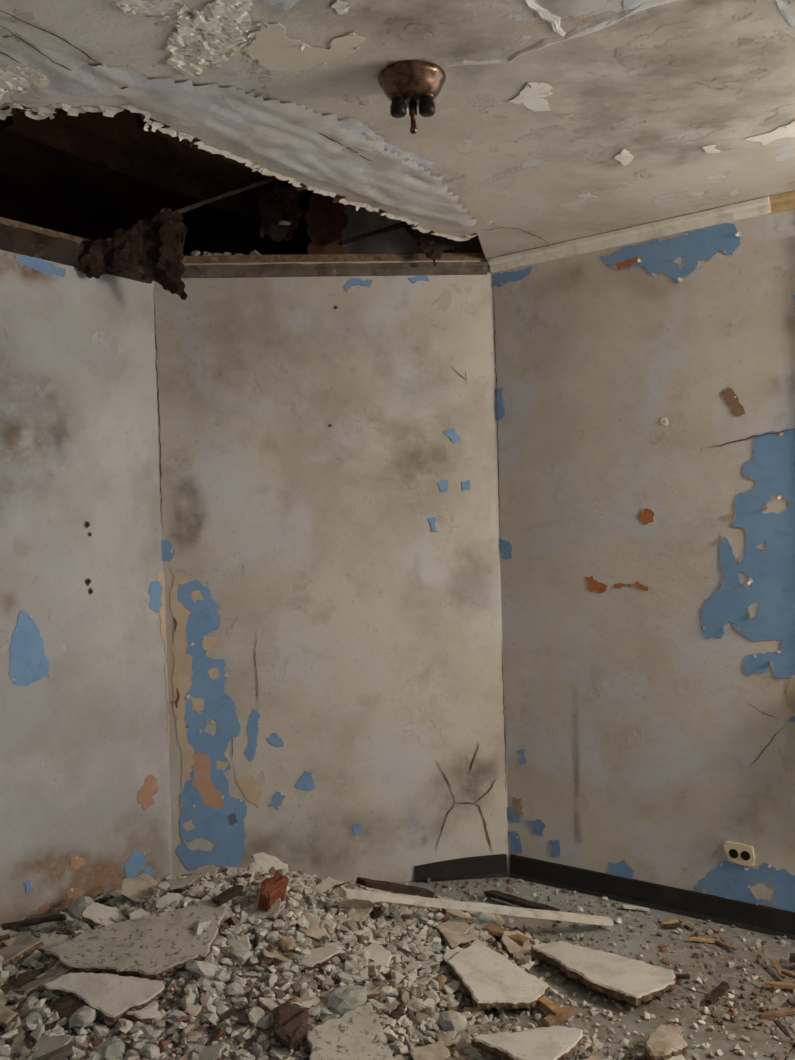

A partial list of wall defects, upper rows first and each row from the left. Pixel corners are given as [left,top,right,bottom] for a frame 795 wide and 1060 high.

peeling [108,0,366,77]
spalling [0,64,478,241]
peeling [745,120,795,145]
peeling [15,255,66,277]
peeling [600,223,742,284]
peeling [700,429,795,723]
peeling [9,610,50,686]
peeling [149,540,285,870]
peeling [295,771,316,791]
peeling [692,861,795,912]